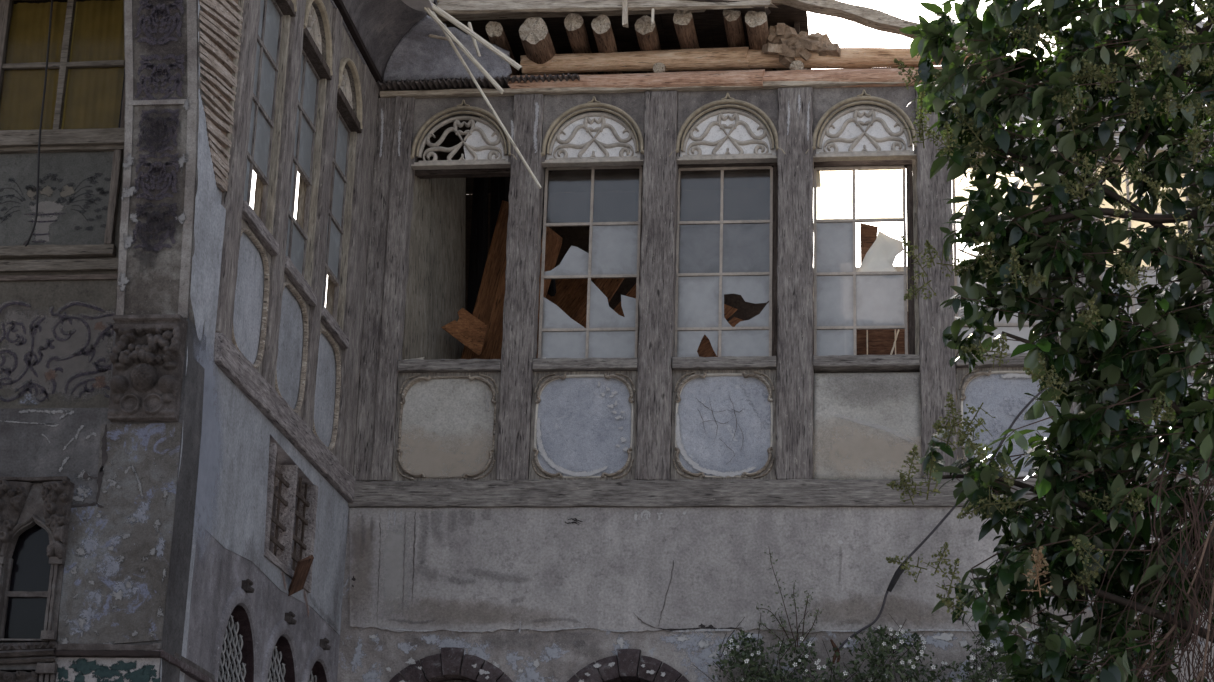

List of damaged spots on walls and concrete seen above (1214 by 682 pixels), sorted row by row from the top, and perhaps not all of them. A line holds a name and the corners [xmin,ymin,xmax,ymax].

crack [675,381,771,477]
peeling [61,460,168,644]
peeling [56,658,161,682]
peeling [351,621,638,682]
peeling [660,629,762,682]